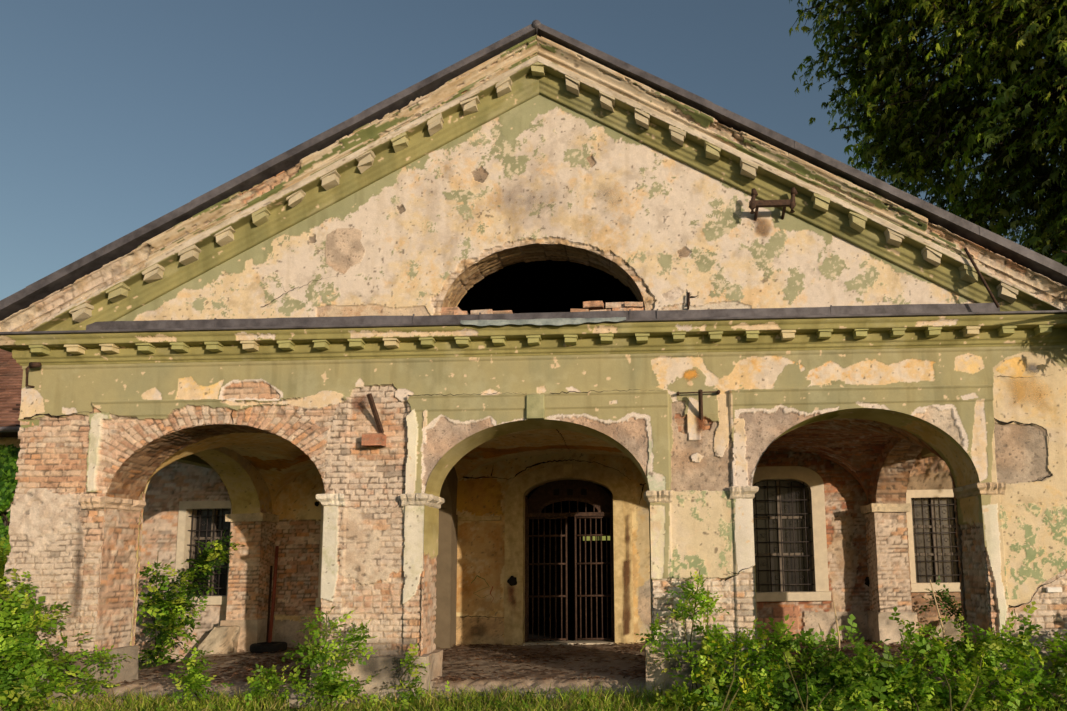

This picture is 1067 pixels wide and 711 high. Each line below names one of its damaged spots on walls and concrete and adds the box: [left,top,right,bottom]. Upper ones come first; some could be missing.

peeling [0,34,1067,347]
flaking render [5,376,527,657]
crack [462,429,646,504]
peeling [546,351,1067,650]